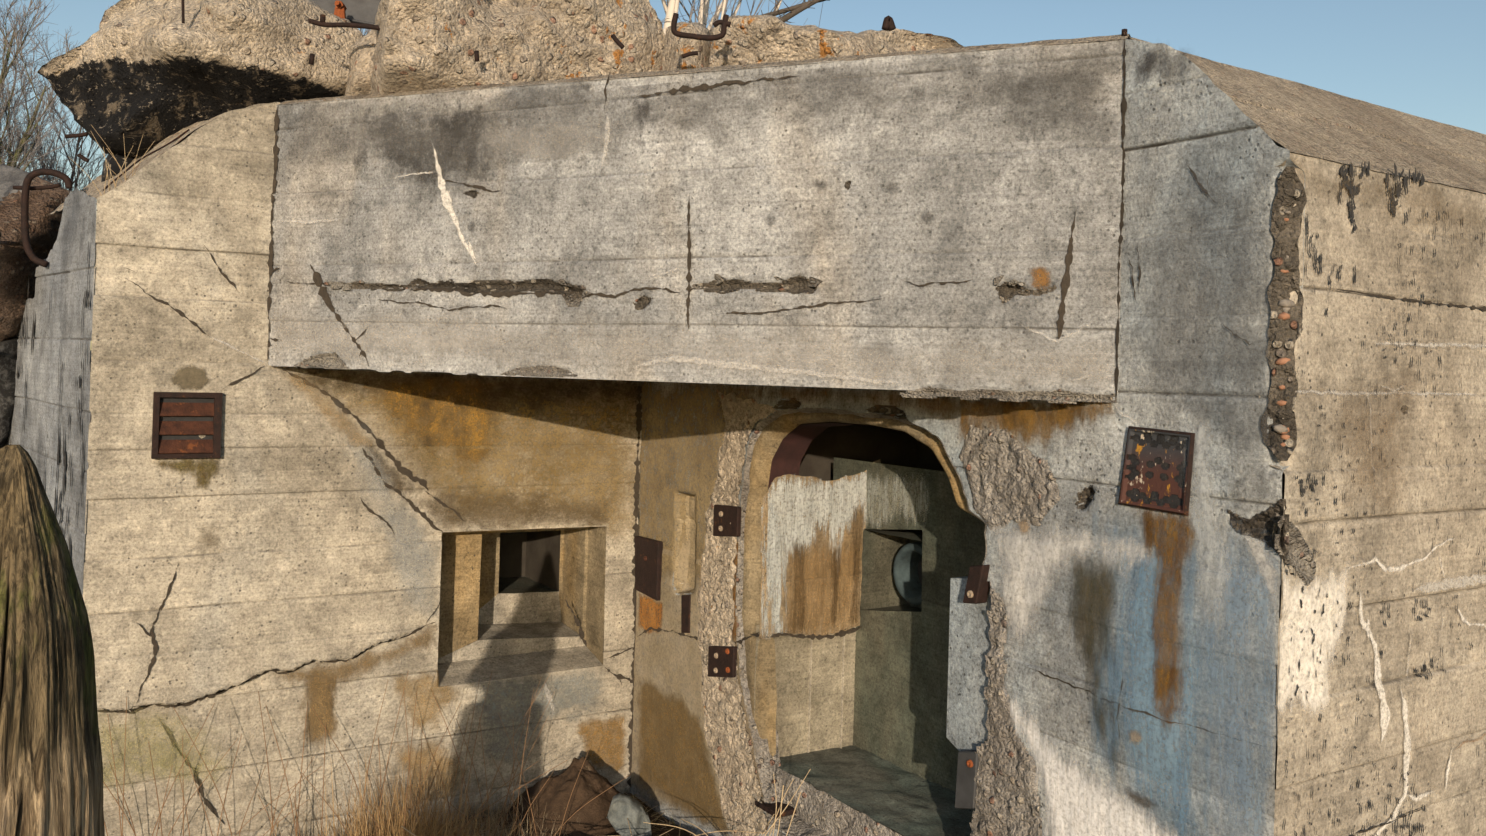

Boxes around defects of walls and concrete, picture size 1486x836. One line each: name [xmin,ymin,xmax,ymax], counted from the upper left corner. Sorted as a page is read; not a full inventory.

crack [444,180,500,192]
crack [371,284,679,311]
spalling [1261,166,1307,461]
leakage [1339,178,1357,233]
crack [97,564,446,824]
crack [223,366,466,533]
spalling [697,389,802,836]
spalling [969,588,1042,836]
leakage [999,426,1295,836]
rust [1144,510,1194,723]
spalling [1227,499,1316,586]
leakage [1328,578,1452,836]